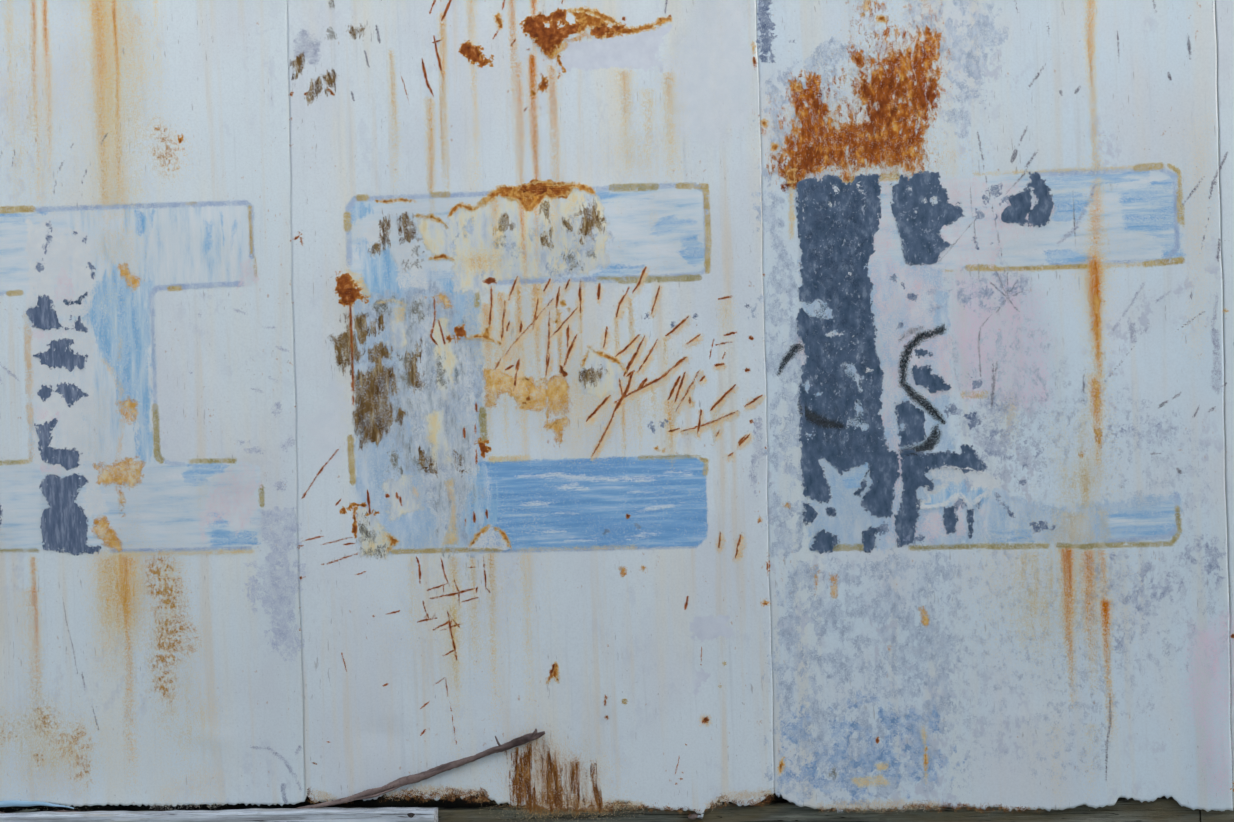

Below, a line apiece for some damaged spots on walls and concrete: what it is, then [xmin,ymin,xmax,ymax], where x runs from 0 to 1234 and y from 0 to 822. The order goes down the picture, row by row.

rust [117,262,142,294]
rust [79,336,227,793]
peeling [339,490,400,560]
rust [381,449,425,523]
peeling [351,221,512,559]
peeling [374,196,491,229]
rust [335,0,693,471]
rust [372,527,786,822]
peeling [578,345,627,401]
rust [751,0,986,217]
peeling [748,0,1231,812]
rust [954,0,1151,809]